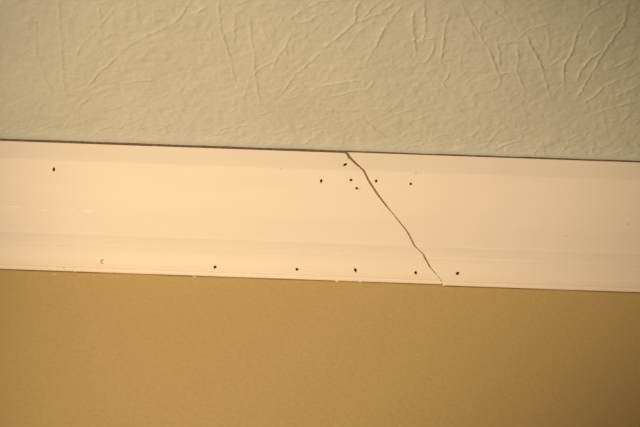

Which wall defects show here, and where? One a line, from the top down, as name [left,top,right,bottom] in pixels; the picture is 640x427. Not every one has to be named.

crack [345,153,442,284]